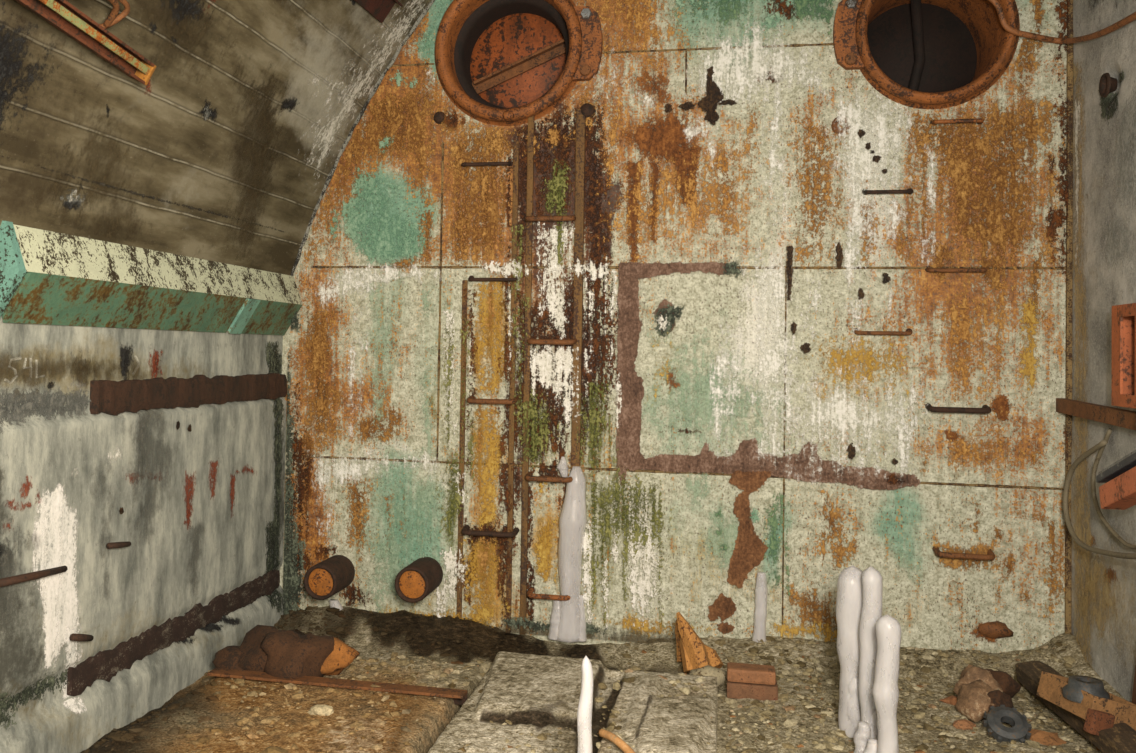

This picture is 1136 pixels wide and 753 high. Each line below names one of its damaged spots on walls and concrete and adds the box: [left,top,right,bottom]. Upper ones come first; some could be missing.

leakage [0,2,54,130]
peeling [673,0,835,37]
peeling [315,167,426,425]
leakage [328,263,437,291]
corrosion [290,0,1070,632]
peeling [421,310,473,453]
leakage [479,159,674,644]
leakage [32,484,87,713]
corrosion [604,613,676,637]
corrosion [769,578,837,642]
corrosion [967,623,997,642]